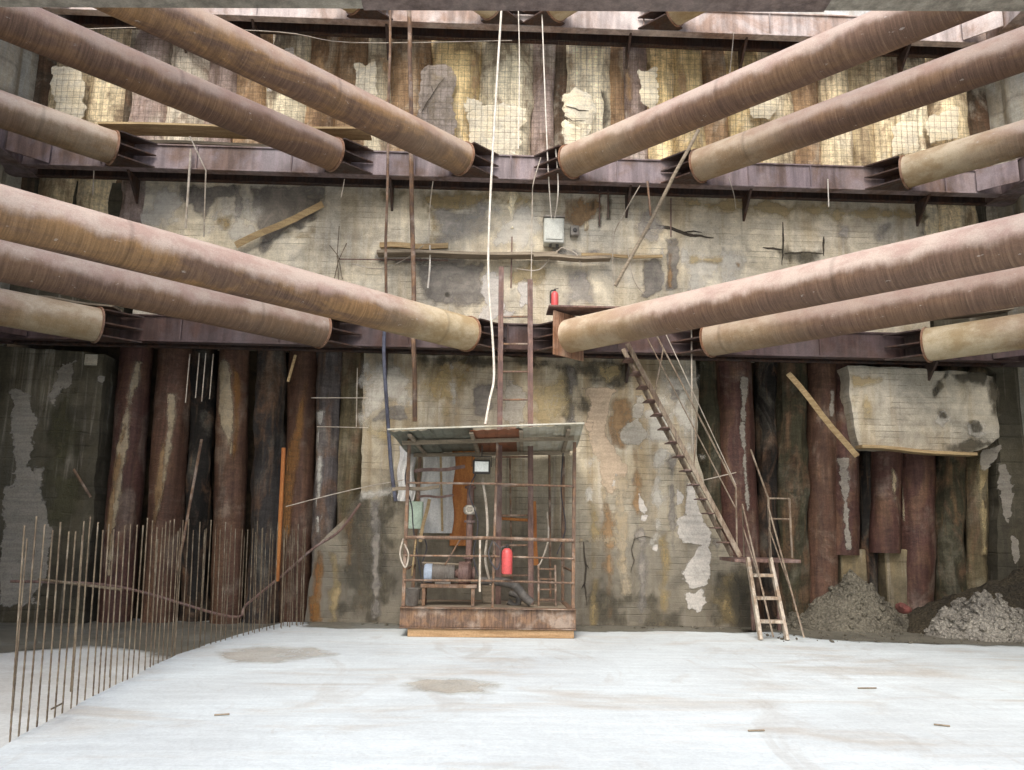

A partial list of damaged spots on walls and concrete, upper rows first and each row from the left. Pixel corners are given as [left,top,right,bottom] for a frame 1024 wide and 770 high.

spalling [416,64,458,136]
water stain [142,185,325,252]
crack [661,225,714,238]
water stain [47,360,77,406]
water stain [359,363,412,440]
corrosion [608,399,633,448]
water stain [0,388,54,607]
water stain [330,486,399,622]